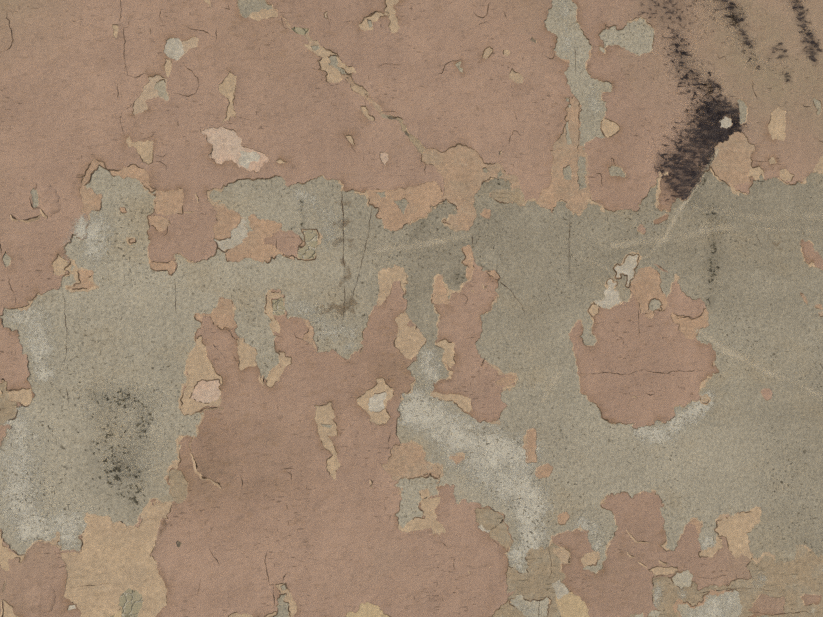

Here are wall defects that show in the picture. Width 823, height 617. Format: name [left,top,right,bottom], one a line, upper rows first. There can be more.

peeling [237,0,375,121]
peeling [359,0,400,33]
flaking render [544,0,620,214]
flaking render [598,17,655,56]
water stain [657,44,746,201]
flaking render [737,99,747,124]
peeling [768,108,786,141]
water stain [793,4,821,62]
flaking render [0,131,823,617]
crack [591,360,705,396]
water stain [85,390,153,509]
water stain [397,347,554,573]